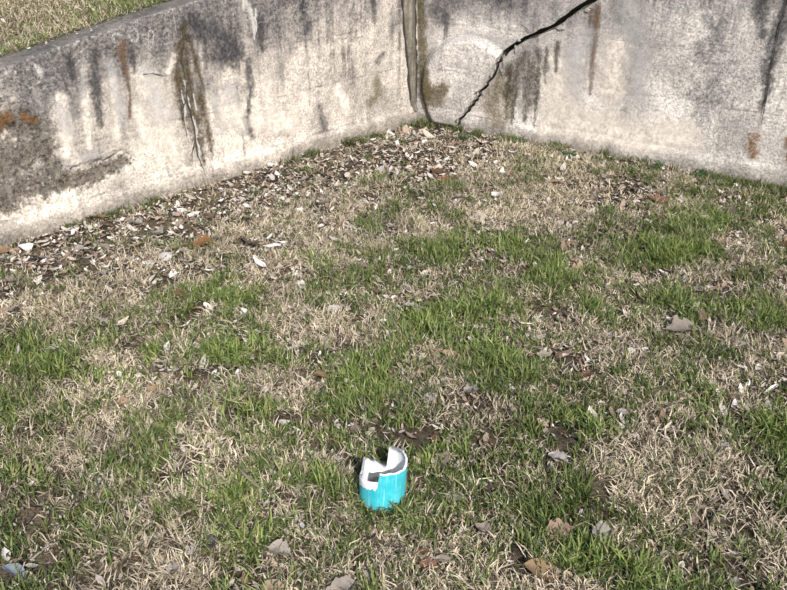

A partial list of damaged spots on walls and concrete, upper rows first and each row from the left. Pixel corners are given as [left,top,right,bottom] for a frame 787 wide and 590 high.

water stain [51,12,295,170]
water stain [332,83,353,116]
crack [456,0,600,128]
rust [589,4,600,95]
water stain [504,1,728,159]
water stain [755,0,787,111]